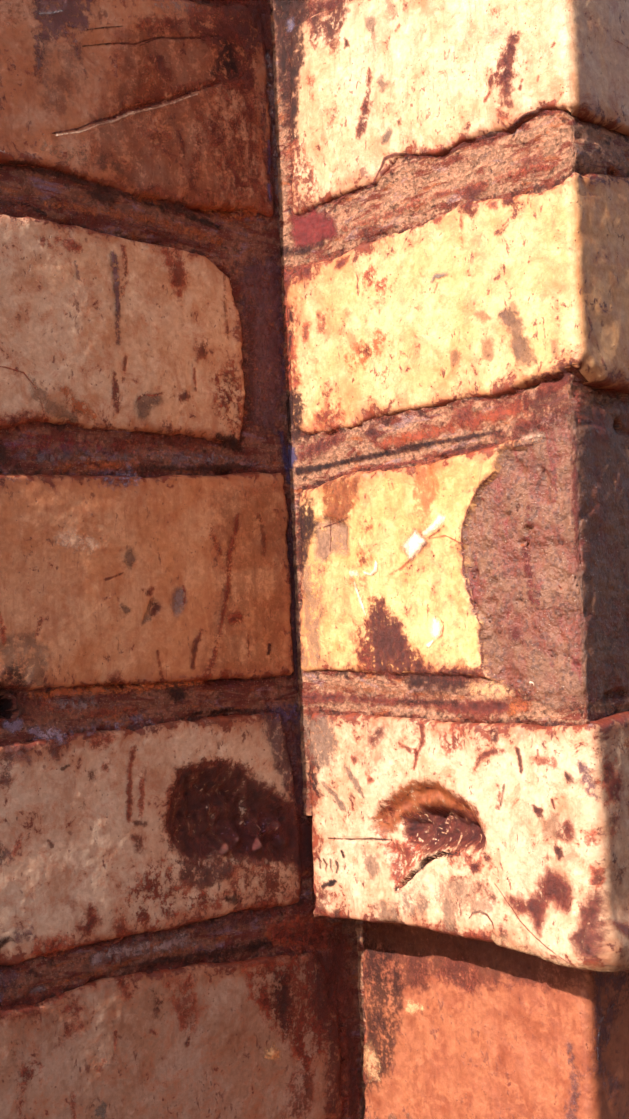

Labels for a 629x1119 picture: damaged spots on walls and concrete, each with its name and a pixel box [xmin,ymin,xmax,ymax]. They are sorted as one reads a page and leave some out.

rust [483,32,523,120]
crack [52,77,219,136]
leakage [471,683,506,696]